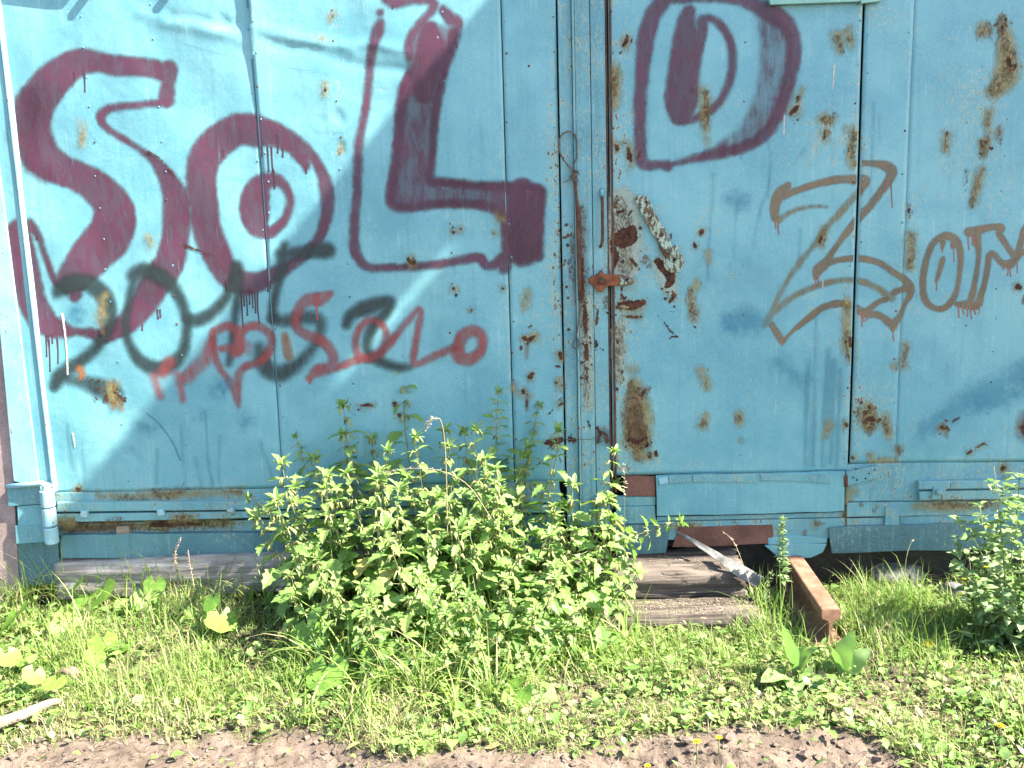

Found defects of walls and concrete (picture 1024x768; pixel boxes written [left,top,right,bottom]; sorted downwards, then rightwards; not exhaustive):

rust [832,31,852,52]
rust [700,88,710,133]
rust [819,112,837,140]
rust [964,15,1018,208]
rust [847,131,857,167]
peeling [607,187,677,312]
rust [560,206,658,461]
rust [91,379,127,407]
rust [825,401,903,463]
rust [100,483,243,501]
rust [58,512,232,533]